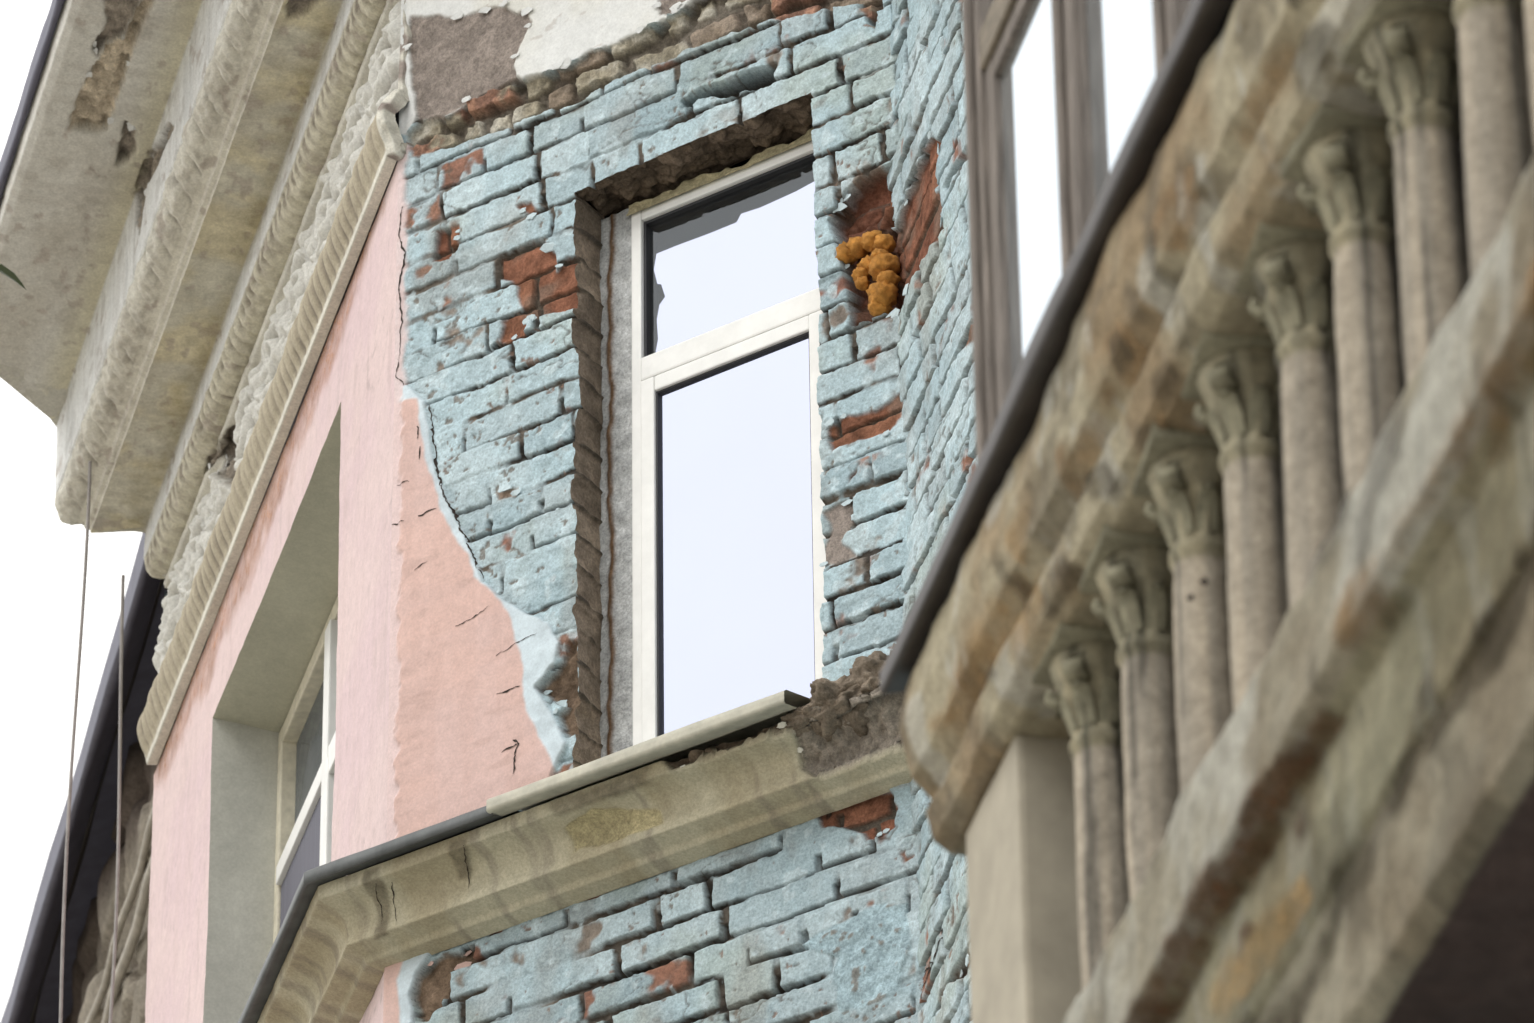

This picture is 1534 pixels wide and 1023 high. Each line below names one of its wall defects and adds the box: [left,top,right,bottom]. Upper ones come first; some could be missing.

flaking render [285,0,322,20]
flaking render [69,0,174,236]
spalling [402,0,884,158]
flaking render [435,226,461,262]
peeling [517,202,541,220]
flaking render [831,131,944,327]
flaking render [499,241,581,347]
flaking render [824,394,904,451]
peeling [496,484,521,500]
flaking render [819,499,857,567]
flaking render [537,641,582,738]
spalling [665,643,906,778]